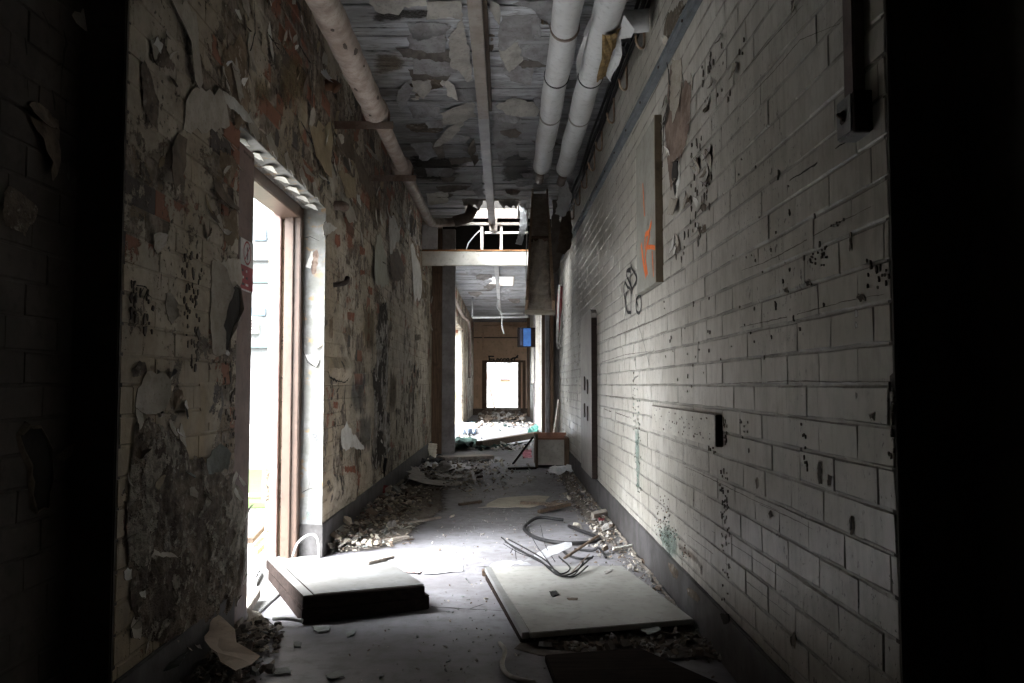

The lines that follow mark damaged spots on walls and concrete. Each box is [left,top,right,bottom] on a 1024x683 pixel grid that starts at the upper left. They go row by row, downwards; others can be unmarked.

peeling [140,0,257,196]
peeling [369,0,463,20]
peeling [395,47,484,211]
peeling [499,189,520,210]
peeling [496,97,541,138]
peeling [489,0,553,69]
peeling [660,33,731,263]
peeling [303,107,433,473]
peeling [123,251,254,654]